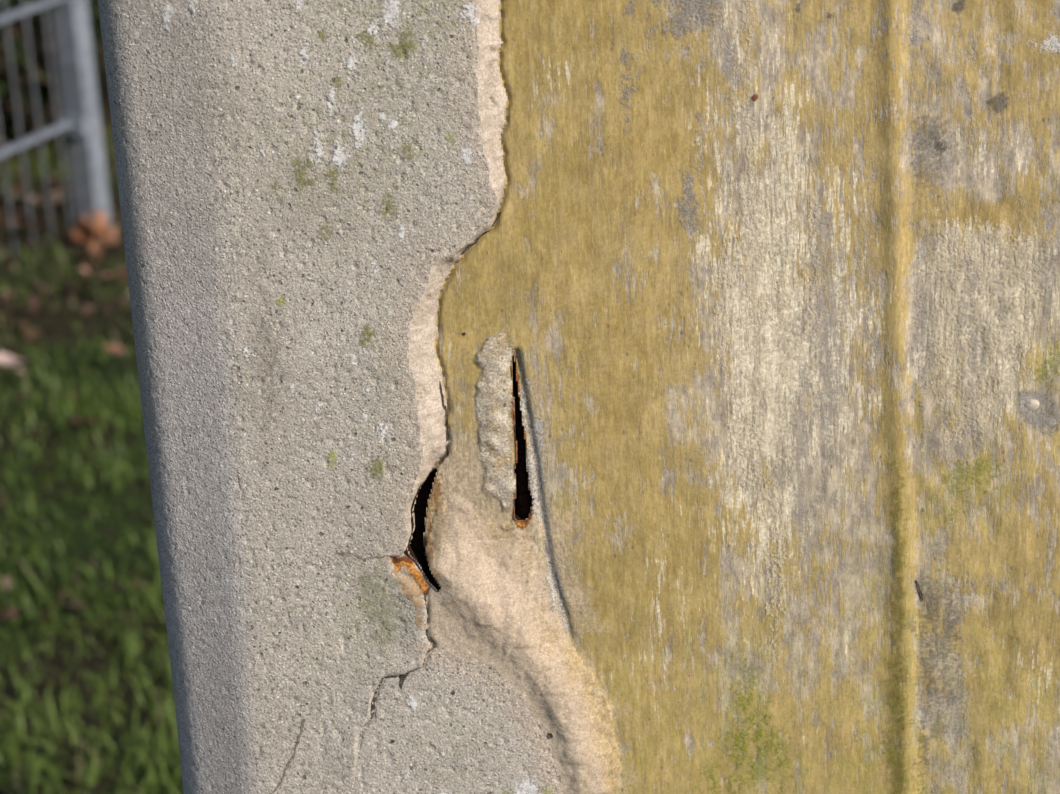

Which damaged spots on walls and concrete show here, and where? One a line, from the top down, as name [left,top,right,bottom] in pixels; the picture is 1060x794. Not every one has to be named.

corrosion [510,351,534,530]
spalling [403,0,1060,794]
corrosion [389,473,443,630]
crack [358,585,436,747]